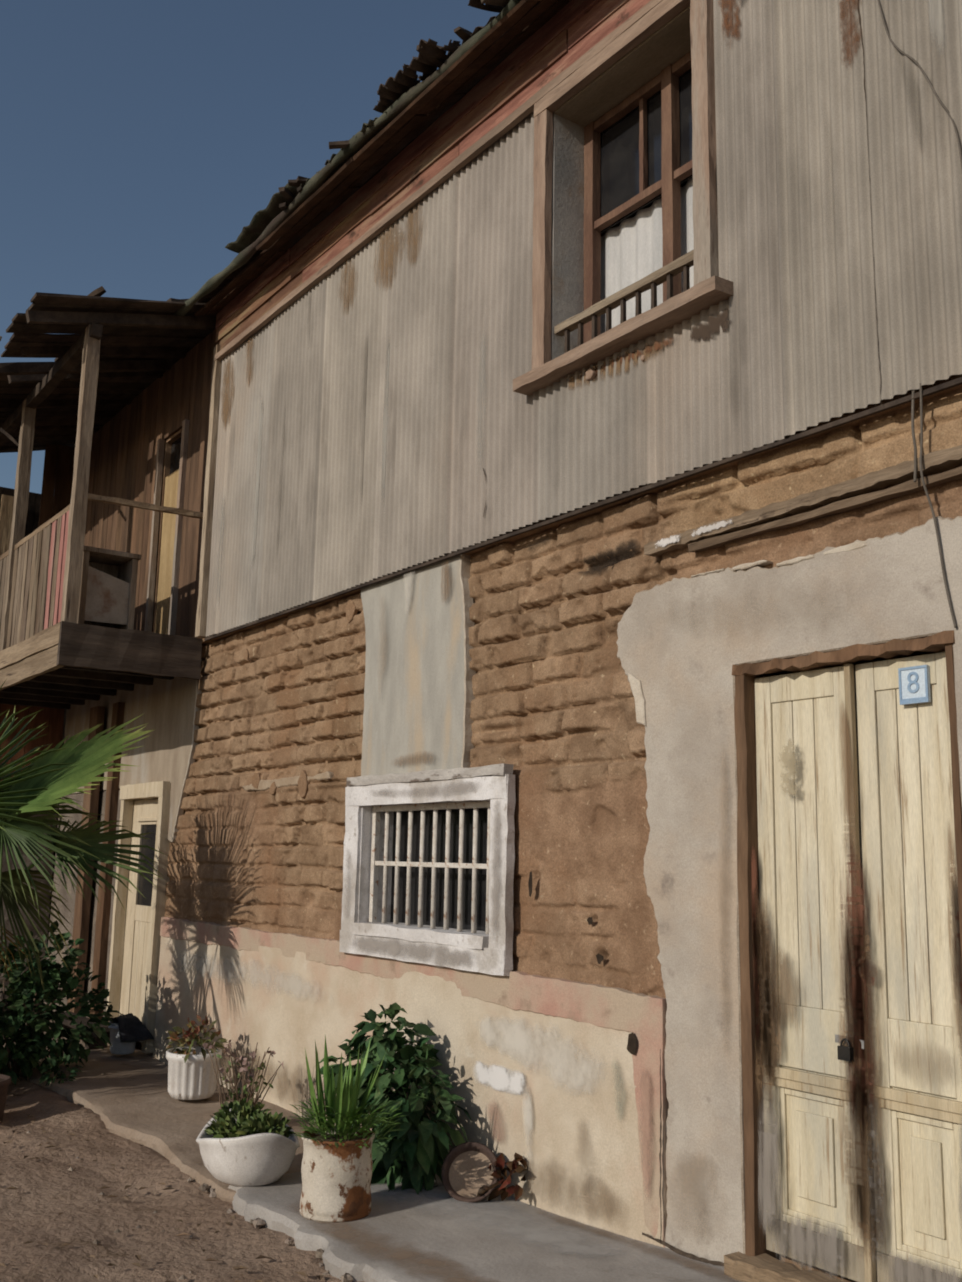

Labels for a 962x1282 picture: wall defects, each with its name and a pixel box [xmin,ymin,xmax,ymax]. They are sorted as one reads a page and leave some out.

corrosion [721,0,740,37]
corrosion [840,0,860,62]
crack [857,0,882,406]
spalling [690,308,730,341]
spalling [568,338,672,388]
spalling [468,388,962,998]
water stain [839,707,883,1254]